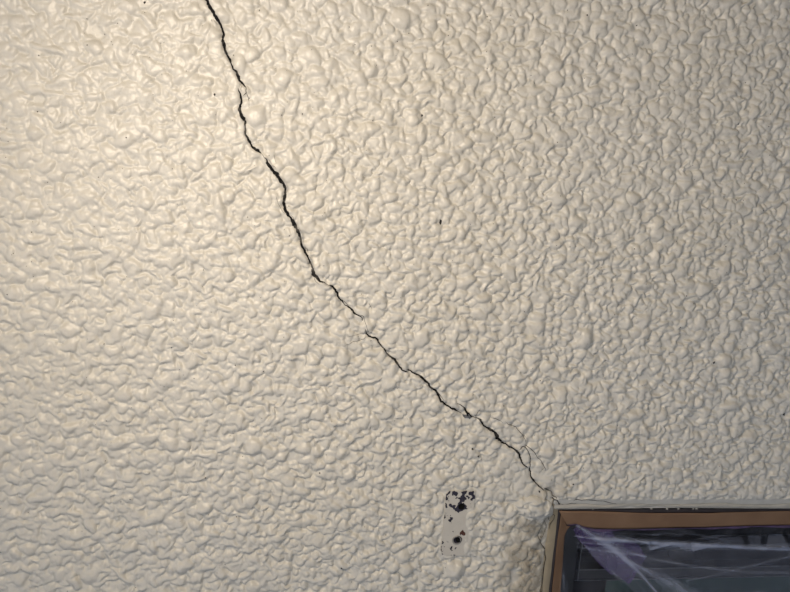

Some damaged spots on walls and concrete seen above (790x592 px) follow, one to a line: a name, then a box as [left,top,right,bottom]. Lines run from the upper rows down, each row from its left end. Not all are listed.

crack [205,0,615,592]